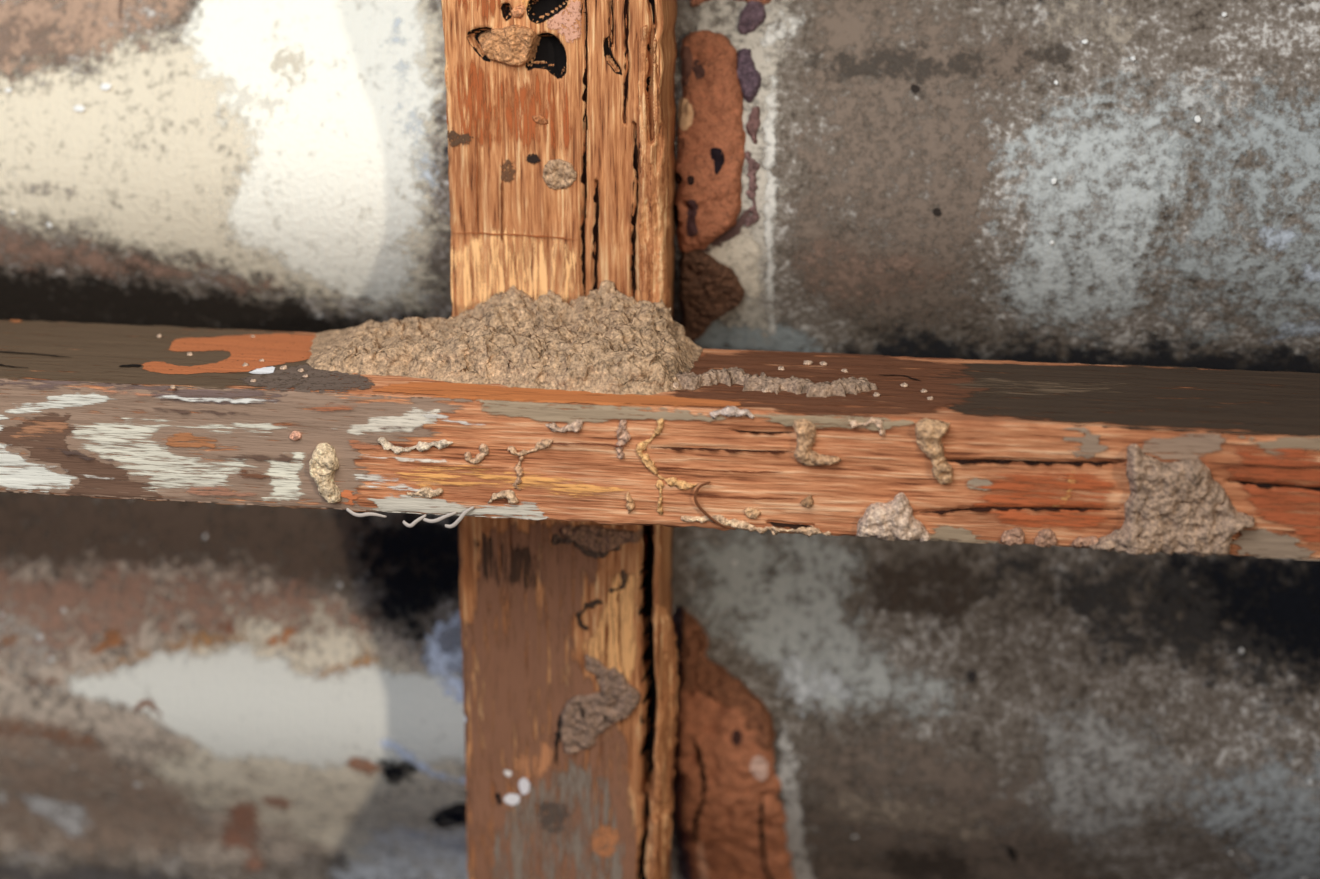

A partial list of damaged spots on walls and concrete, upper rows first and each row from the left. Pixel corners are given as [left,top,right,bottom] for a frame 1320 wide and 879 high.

water stain [0,0,473,333]
crack [455,0,655,299]
water stain [694,0,1320,373]
peeling [0,394,111,492]
peeling [72,415,305,501]
peeling [334,407,441,435]
peeling [354,474,548,520]
crack [604,530,658,879]
water stain [690,529,1320,879]